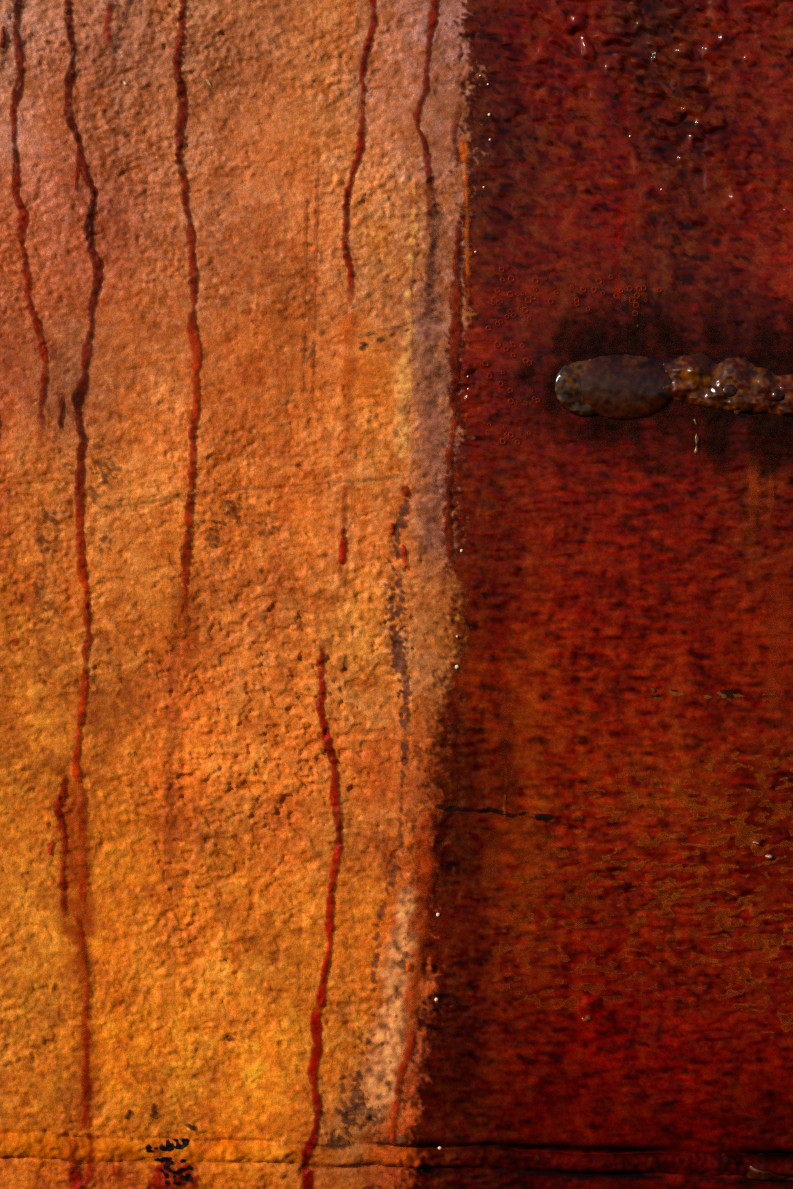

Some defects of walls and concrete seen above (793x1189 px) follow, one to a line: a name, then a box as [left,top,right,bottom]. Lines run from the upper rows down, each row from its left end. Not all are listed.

rust [0,0,48,419]
rust [104,0,112,42]
rust [172,0,201,602]
rust [342,0,376,292]
rust [413,0,438,192]
rust [48,0,102,1189]
rust [338,526,347,564]
rust [301,649,342,1189]